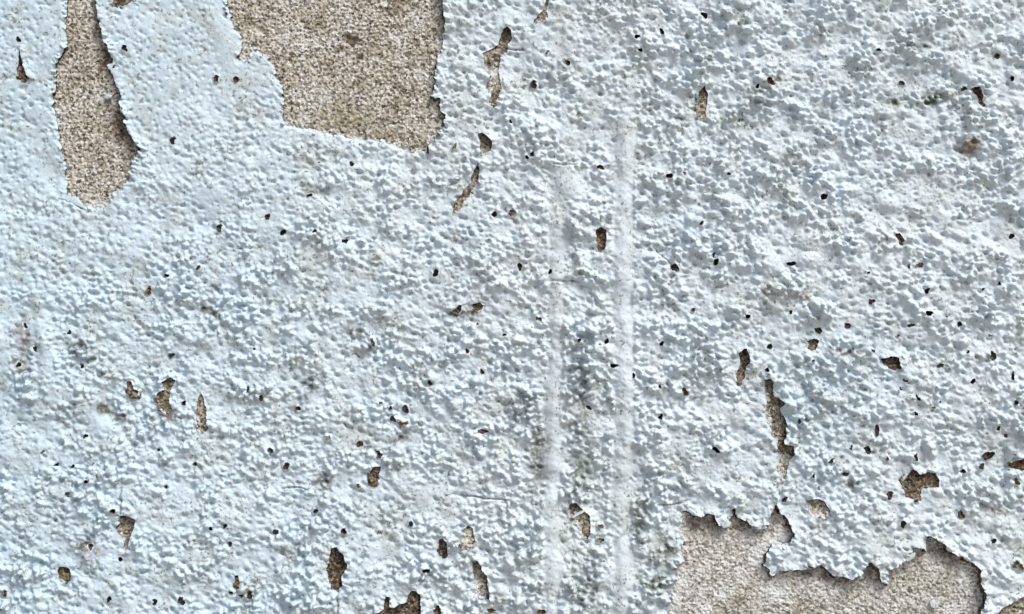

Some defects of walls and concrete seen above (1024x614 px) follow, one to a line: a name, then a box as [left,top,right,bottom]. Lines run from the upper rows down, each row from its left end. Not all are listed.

peeling [52,0,141,210]
peeling [225,0,445,154]
peeling [483,27,512,110]
peeling [452,133,492,213]
peeling [807,329,822,362]
peeling [155,377,175,417]
peeling [764,368,795,482]
peeling [898,460,940,502]
peeling [326,547,347,592]
peeling [376,591,442,614]
peeling [565,503,591,541]
peeling [666,499,987,614]